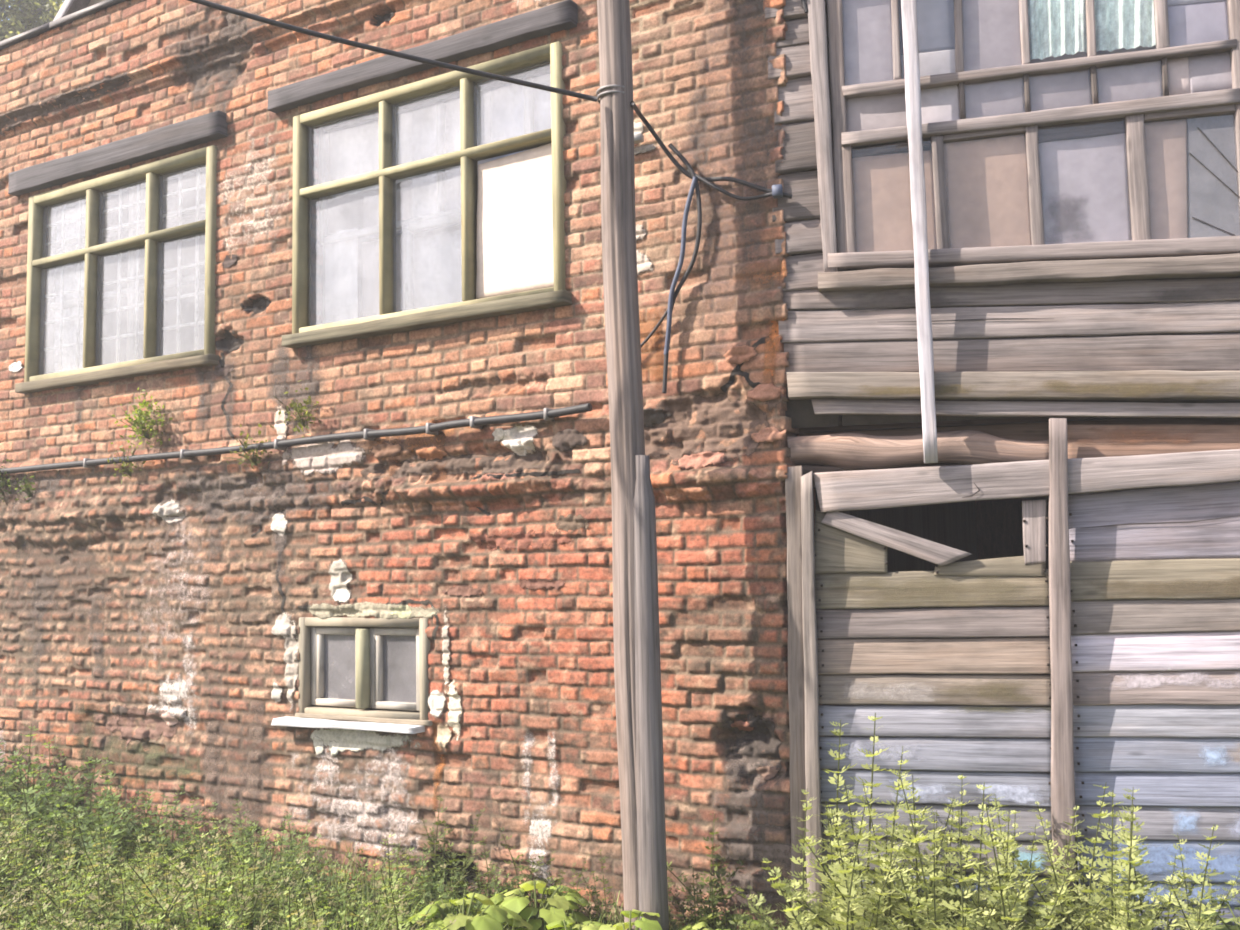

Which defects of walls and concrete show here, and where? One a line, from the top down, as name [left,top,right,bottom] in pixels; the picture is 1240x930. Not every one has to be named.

crack [219,352,235,439]
spalling [274,407,587,481]
spalling [643,383,786,470]
crack [720,333,771,392]
damp [5,544,109,667]
damp [52,460,346,835]
crack [251,496,311,613]
peeling [271,612,299,711]
peeling [309,559,482,748]
crack [386,599,439,640]
damp [291,748,418,859]
damp [713,715,791,909]